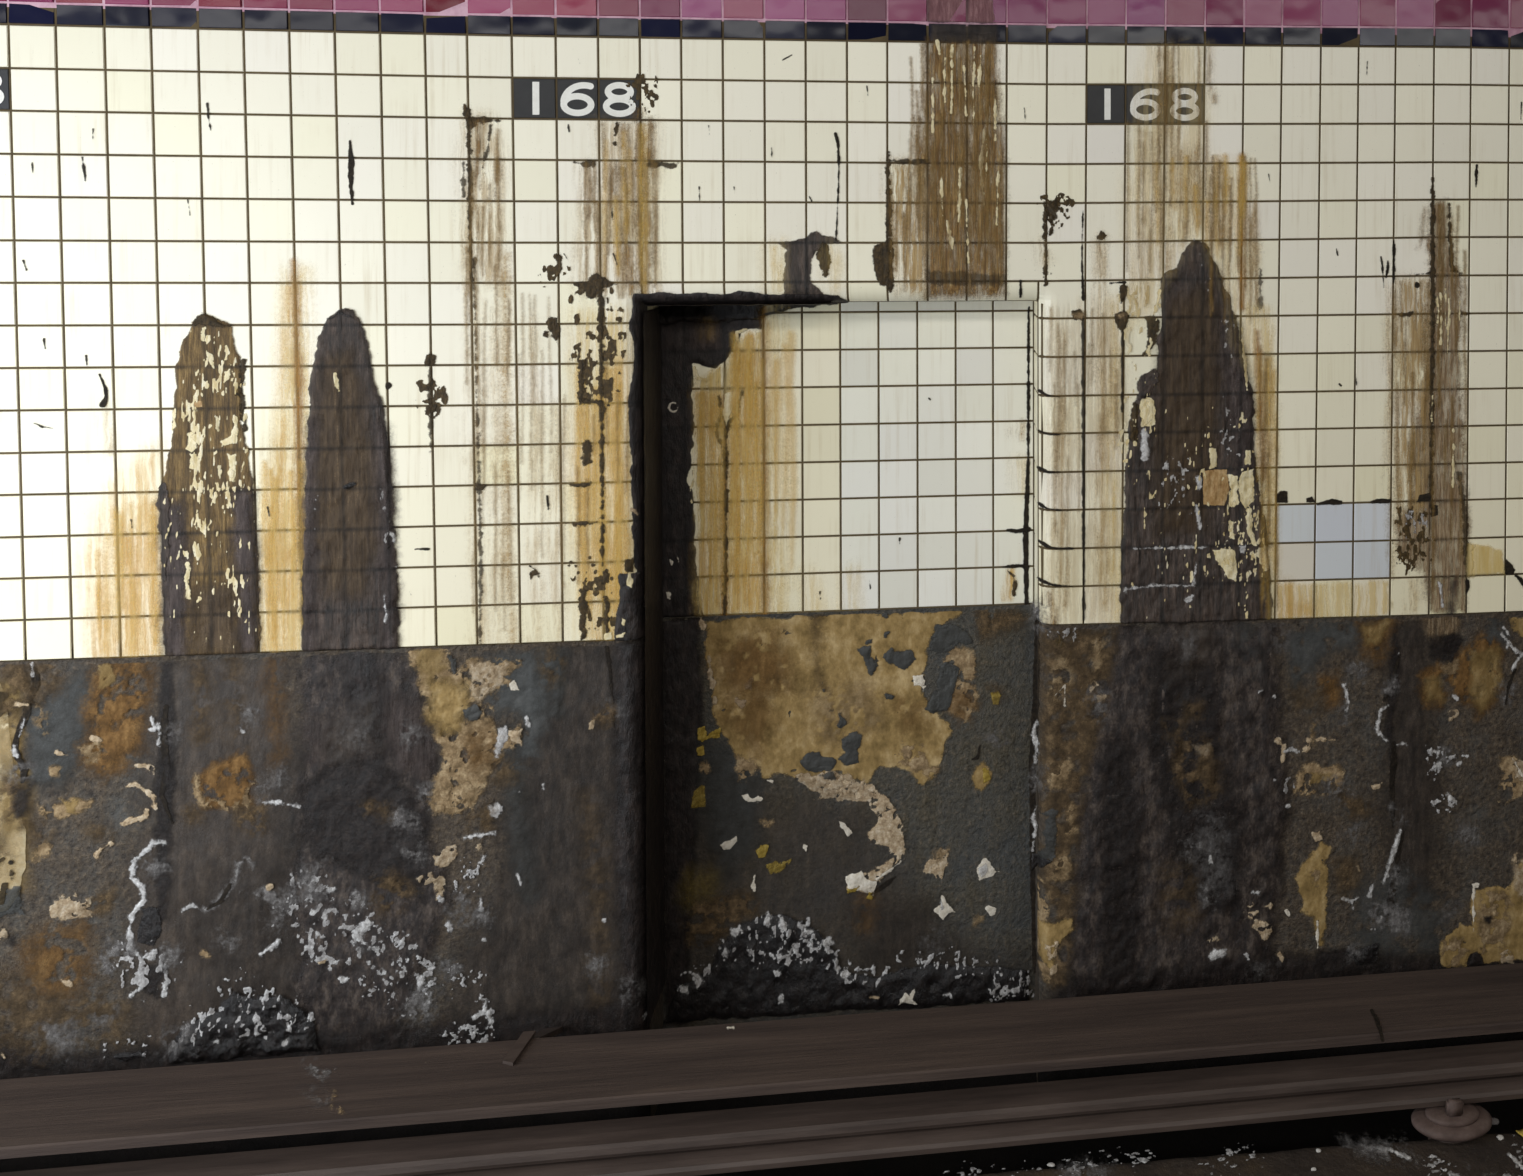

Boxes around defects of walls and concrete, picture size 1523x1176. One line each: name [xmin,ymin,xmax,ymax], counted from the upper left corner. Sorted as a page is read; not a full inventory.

corrosion [872,0,1004,297]
corrosion [1157,45,1263,310]
corrosion [460,104,510,641]
water stain [0,291,1034,1080]
corrosion [540,74,677,641]
corrosion [695,308,782,616]
peeling [687,609,1025,944]
peeling [1037,628,1115,985]
water stain [1053,239,1523,999]
peeling [1248,831,1332,962]
corrosion [1388,177,1470,615]
peeling [1439,853,1523,968]